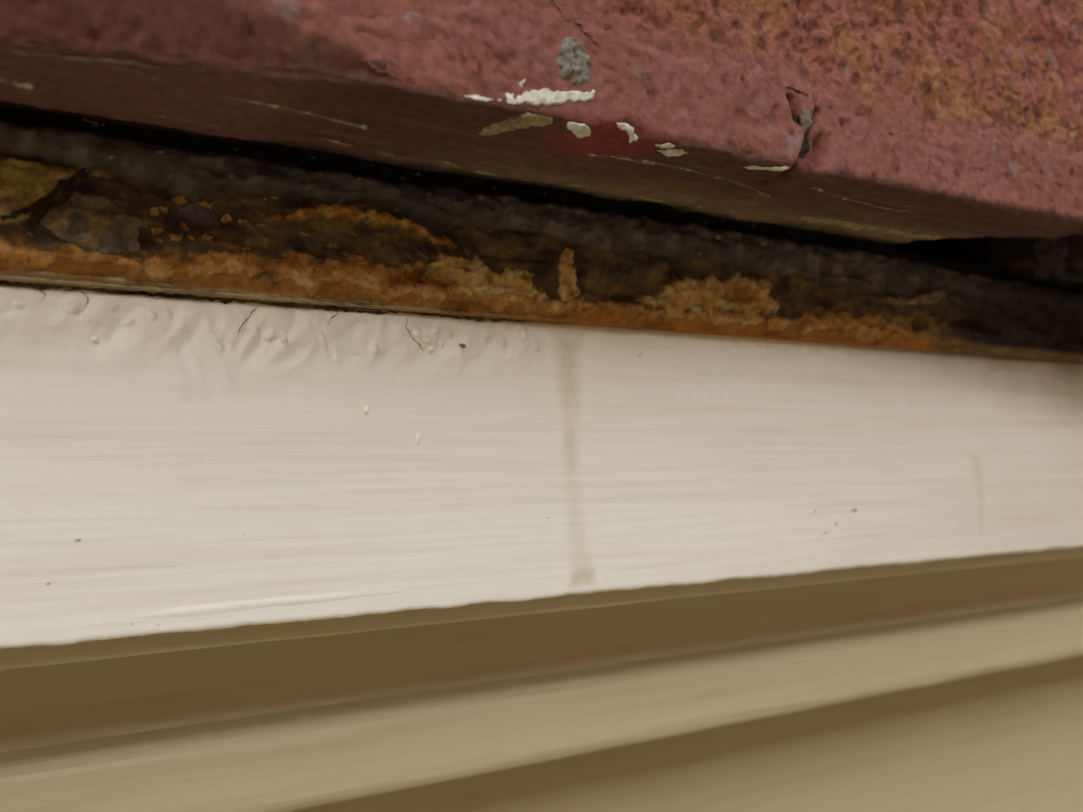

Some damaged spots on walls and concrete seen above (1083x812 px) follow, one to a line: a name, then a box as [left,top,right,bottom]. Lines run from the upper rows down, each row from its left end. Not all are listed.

spalling [554,0,1083,158]
rust [0,157,946,341]
water stain [797,216,956,240]